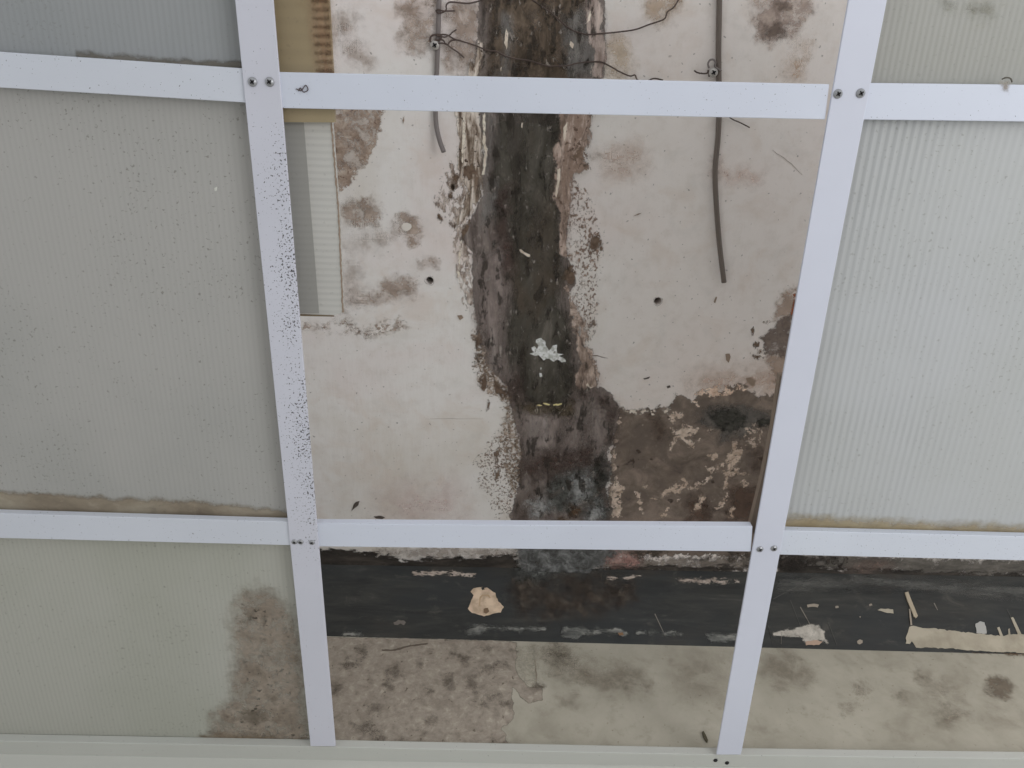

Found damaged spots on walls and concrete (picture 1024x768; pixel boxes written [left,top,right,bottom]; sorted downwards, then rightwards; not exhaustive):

spalling [468,0,607,79]
leakage [754,0,812,41]
leakage [334,109,384,228]
leakage [398,212,421,246]
leakage [350,277,414,304]
spalling [434,112,774,560]
peeling [468,587,504,616]
peeling [906,617,1024,653]
leakage [211,591,307,739]
leakage [986,677,1012,699]